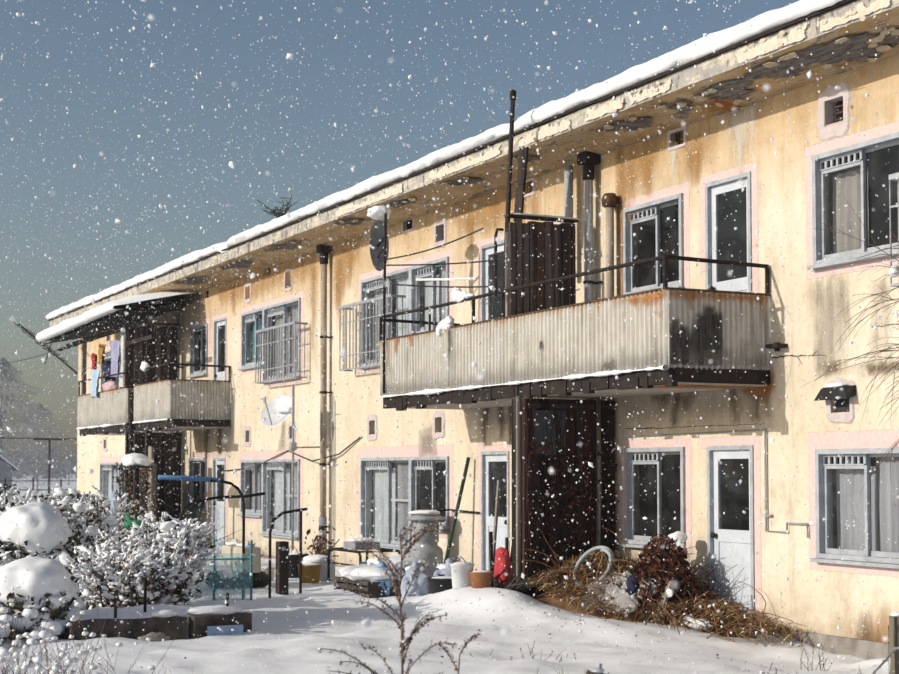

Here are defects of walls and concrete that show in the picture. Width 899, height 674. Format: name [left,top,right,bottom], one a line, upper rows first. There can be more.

spalling [584,0,899,134]
peeling [513,119,570,164]
peeling [428,144,500,187]
rust [629,292,768,320]
water stain [671,307,723,365]